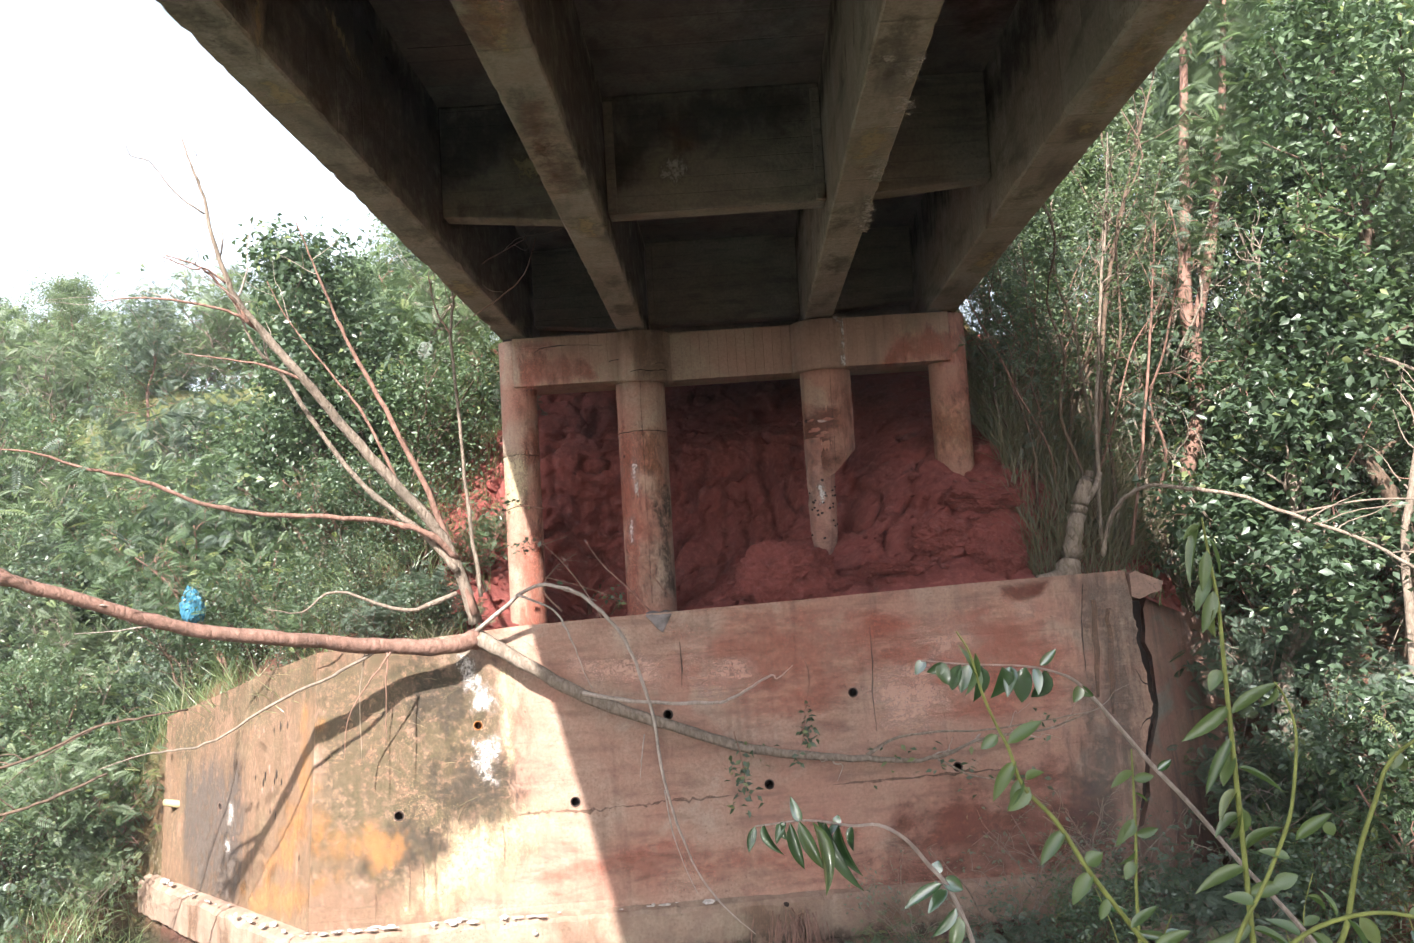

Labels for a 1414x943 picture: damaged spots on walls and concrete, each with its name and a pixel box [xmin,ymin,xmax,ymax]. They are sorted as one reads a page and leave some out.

damp [176,653,546,915]
crack [519,795,731,816]
crack [834,769,1000,785]
crack [1132,601,1155,813]